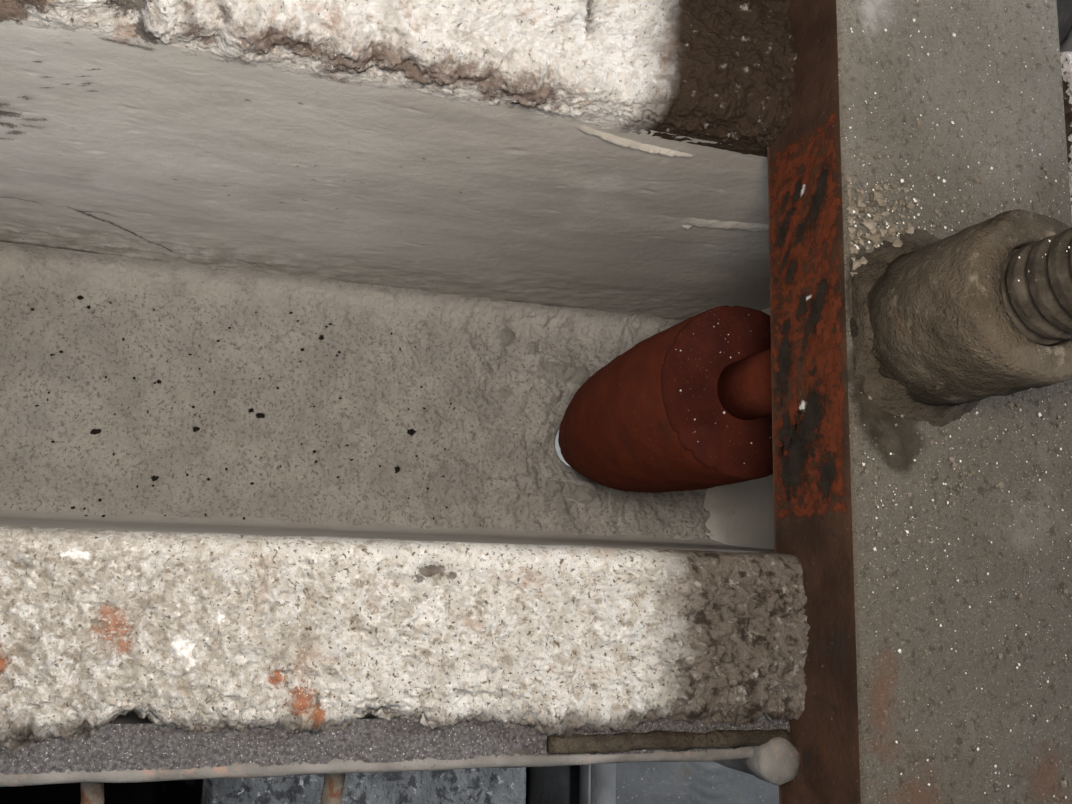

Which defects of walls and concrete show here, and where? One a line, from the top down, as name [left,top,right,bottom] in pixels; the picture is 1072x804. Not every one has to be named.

crack [67,206,172,252]
rust [92,606,132,653]
rust [269,670,325,728]